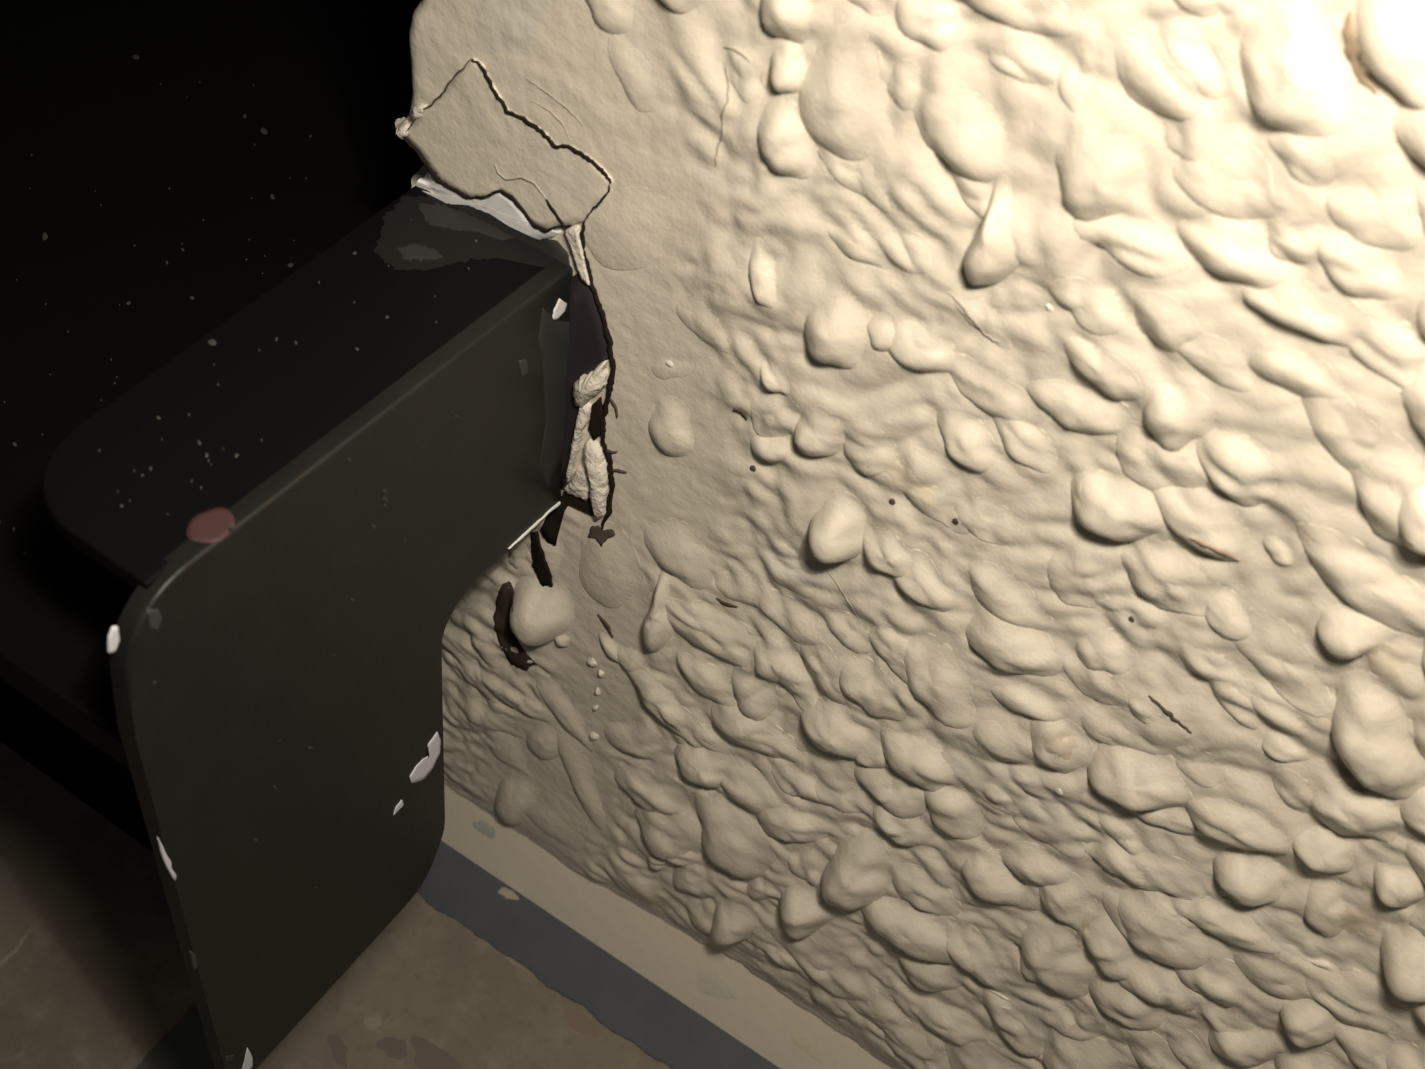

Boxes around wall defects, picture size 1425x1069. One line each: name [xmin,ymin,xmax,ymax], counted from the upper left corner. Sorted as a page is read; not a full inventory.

peeling [395,58,614,285]
crack [403,58,627,530]
peeling [553,299,567,319]
peeling [530,360,616,587]